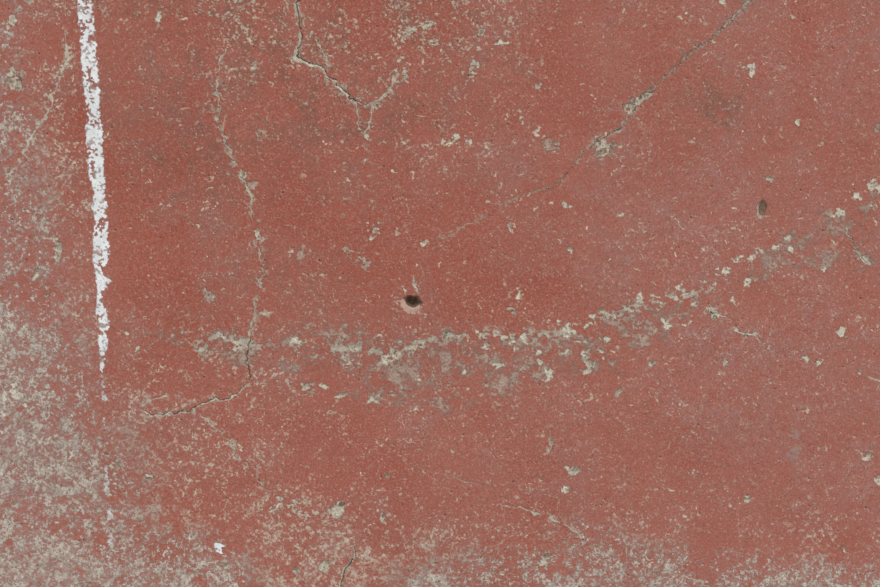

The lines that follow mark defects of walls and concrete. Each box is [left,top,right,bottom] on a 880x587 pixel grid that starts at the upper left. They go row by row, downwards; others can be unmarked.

crack [293,0,440,176]
crack [576,0,751,162]
crack [142,49,270,461]
peeling [192,329,270,366]
peeling [282,203,874,411]
peeling [852,179,880,219]
crack [259,482,357,587]